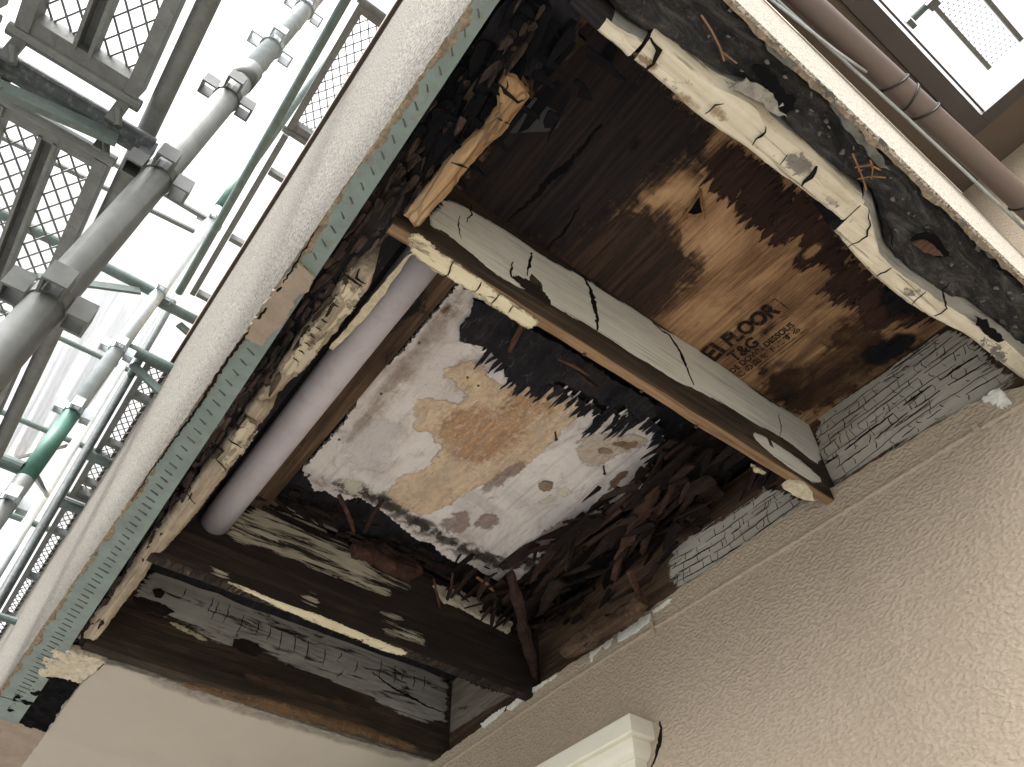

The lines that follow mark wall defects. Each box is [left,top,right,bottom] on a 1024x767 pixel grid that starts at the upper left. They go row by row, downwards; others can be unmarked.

crack [801,166,818,187]
spalling [723,0,1024,288]
spalling [0,0,522,733]
damp [333,361,586,570]
crack [582,275,599,331]
damp [575,433,647,467]
crack [653,323,694,385]
peeling [589,464,807,662]
peeling [408,200,1016,485]
damp [758,318,919,414]
damp [879,287,923,316]
crack [818,283,1001,483]